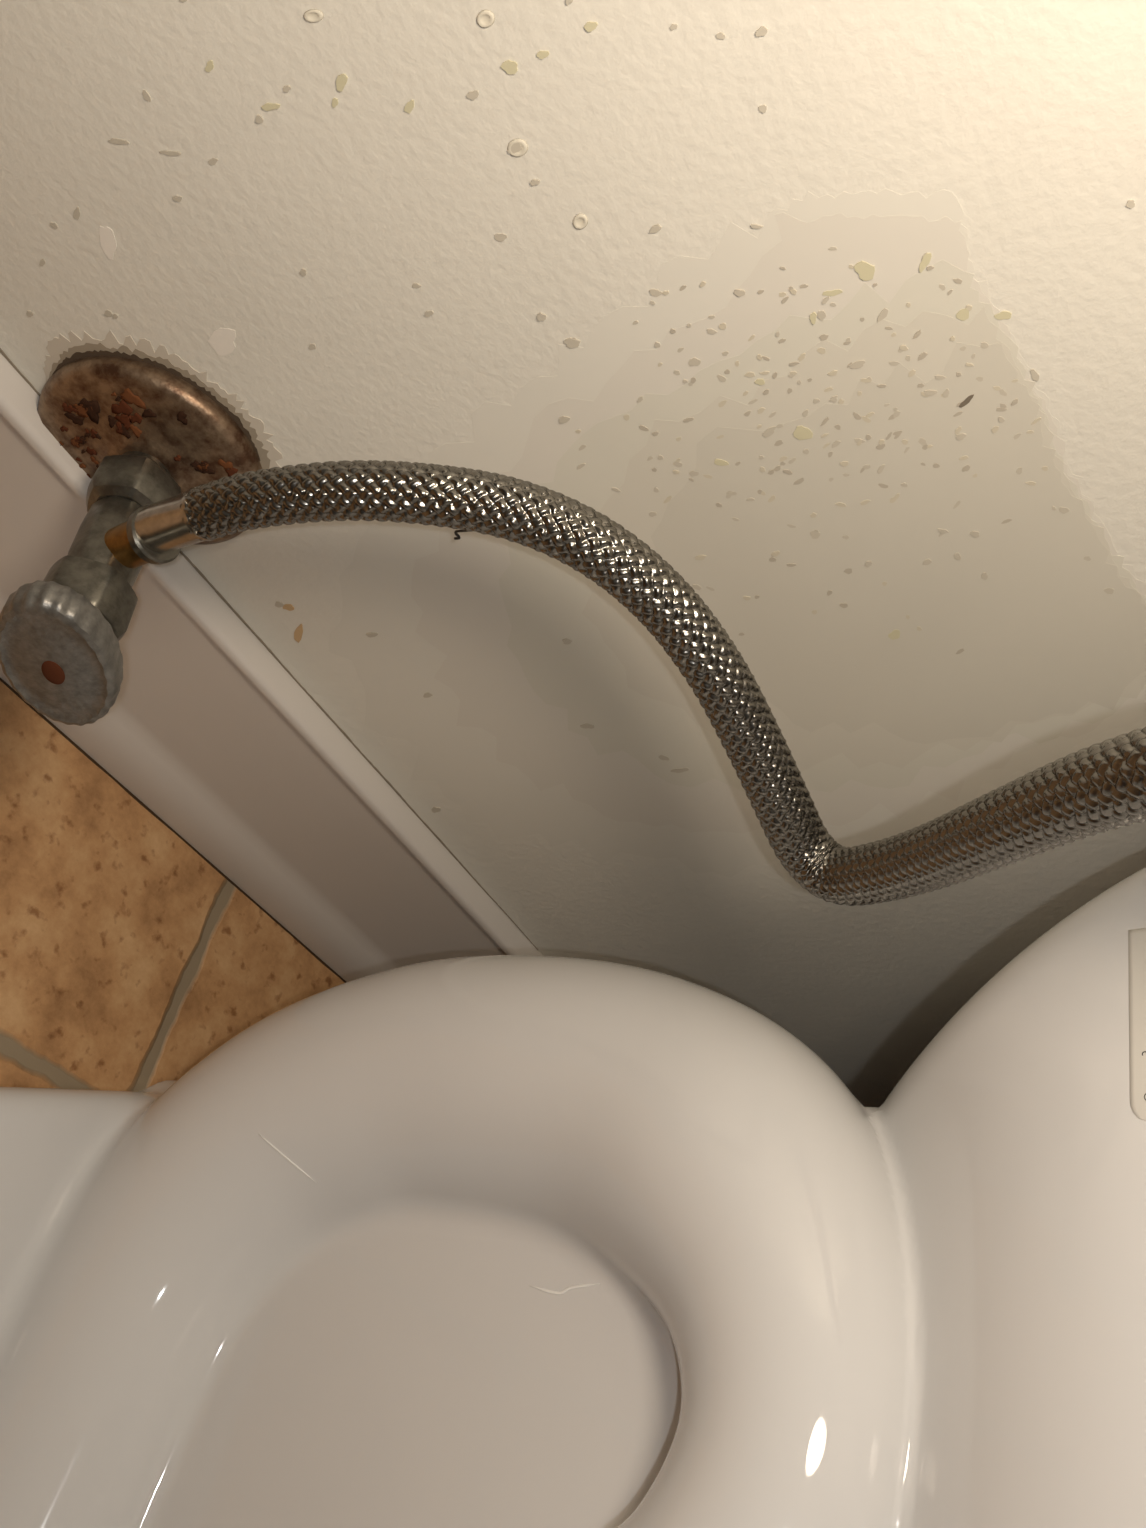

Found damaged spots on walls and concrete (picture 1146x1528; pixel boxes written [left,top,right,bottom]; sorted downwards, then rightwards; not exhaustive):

leakage [428,188,1146,844]